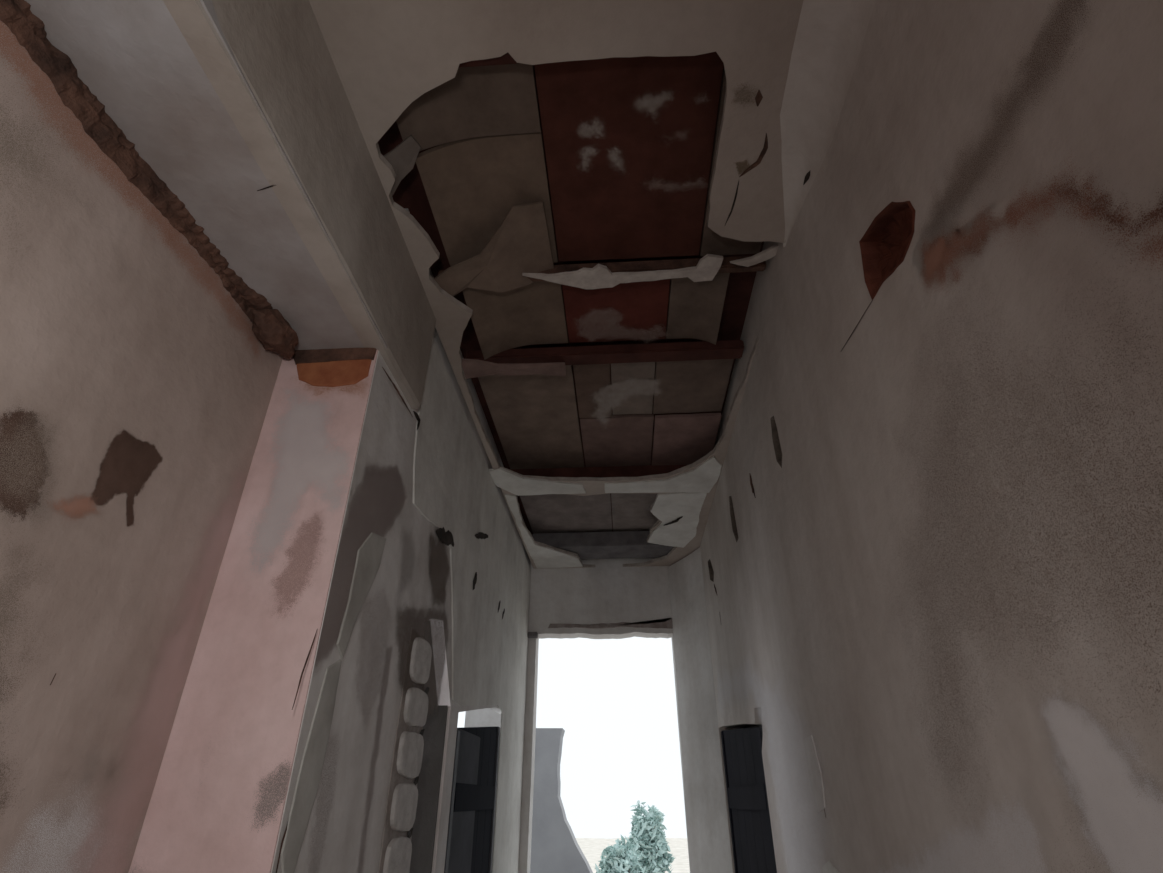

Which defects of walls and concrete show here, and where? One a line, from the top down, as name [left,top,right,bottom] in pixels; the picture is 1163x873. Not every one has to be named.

spalling [0,0,273,324]
peeling [576,116,629,173]
spalling [841,201,915,351]
peeling [0,392,163,542]
spalling [729,496,738,542]
spalling [771,416,782,468]